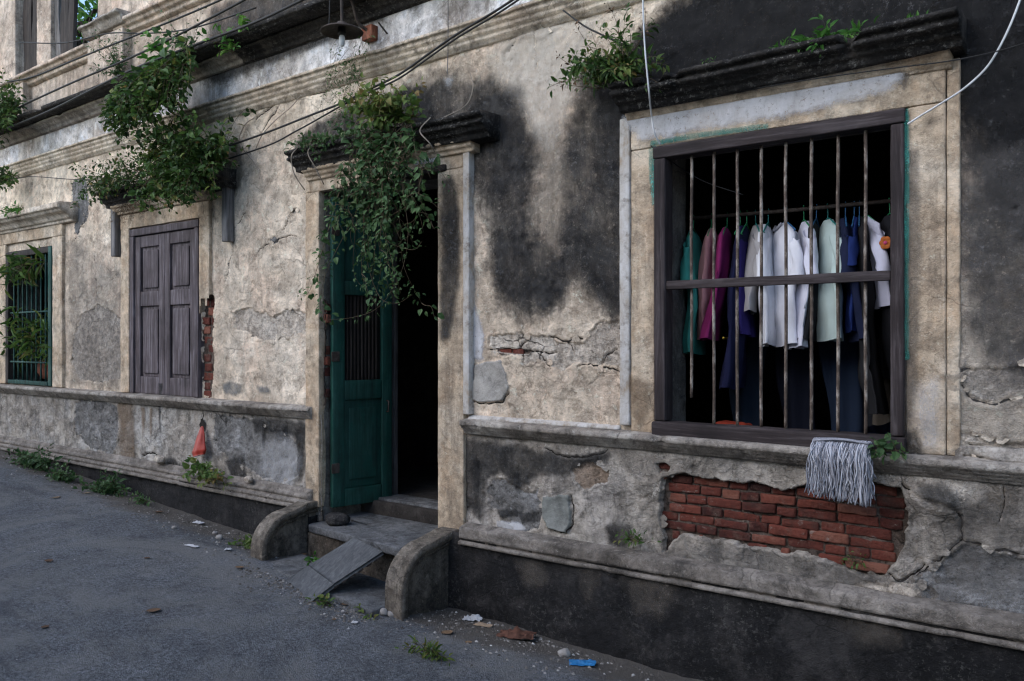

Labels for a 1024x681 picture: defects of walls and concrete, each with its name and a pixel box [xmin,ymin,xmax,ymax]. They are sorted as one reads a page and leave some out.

leakage [295,100,374,148]
leakage [392,24,908,339]
leakage [615,0,1024,376]
flaking render [202,294,215,398]
peeling [489,321,620,372]
leakage [226,455,245,477]
leakage [253,418,305,477]
leakage [465,441,608,518]
peeling [961,430,1024,457]
leakage [497,509,540,530]
flaking render [659,463,909,575]